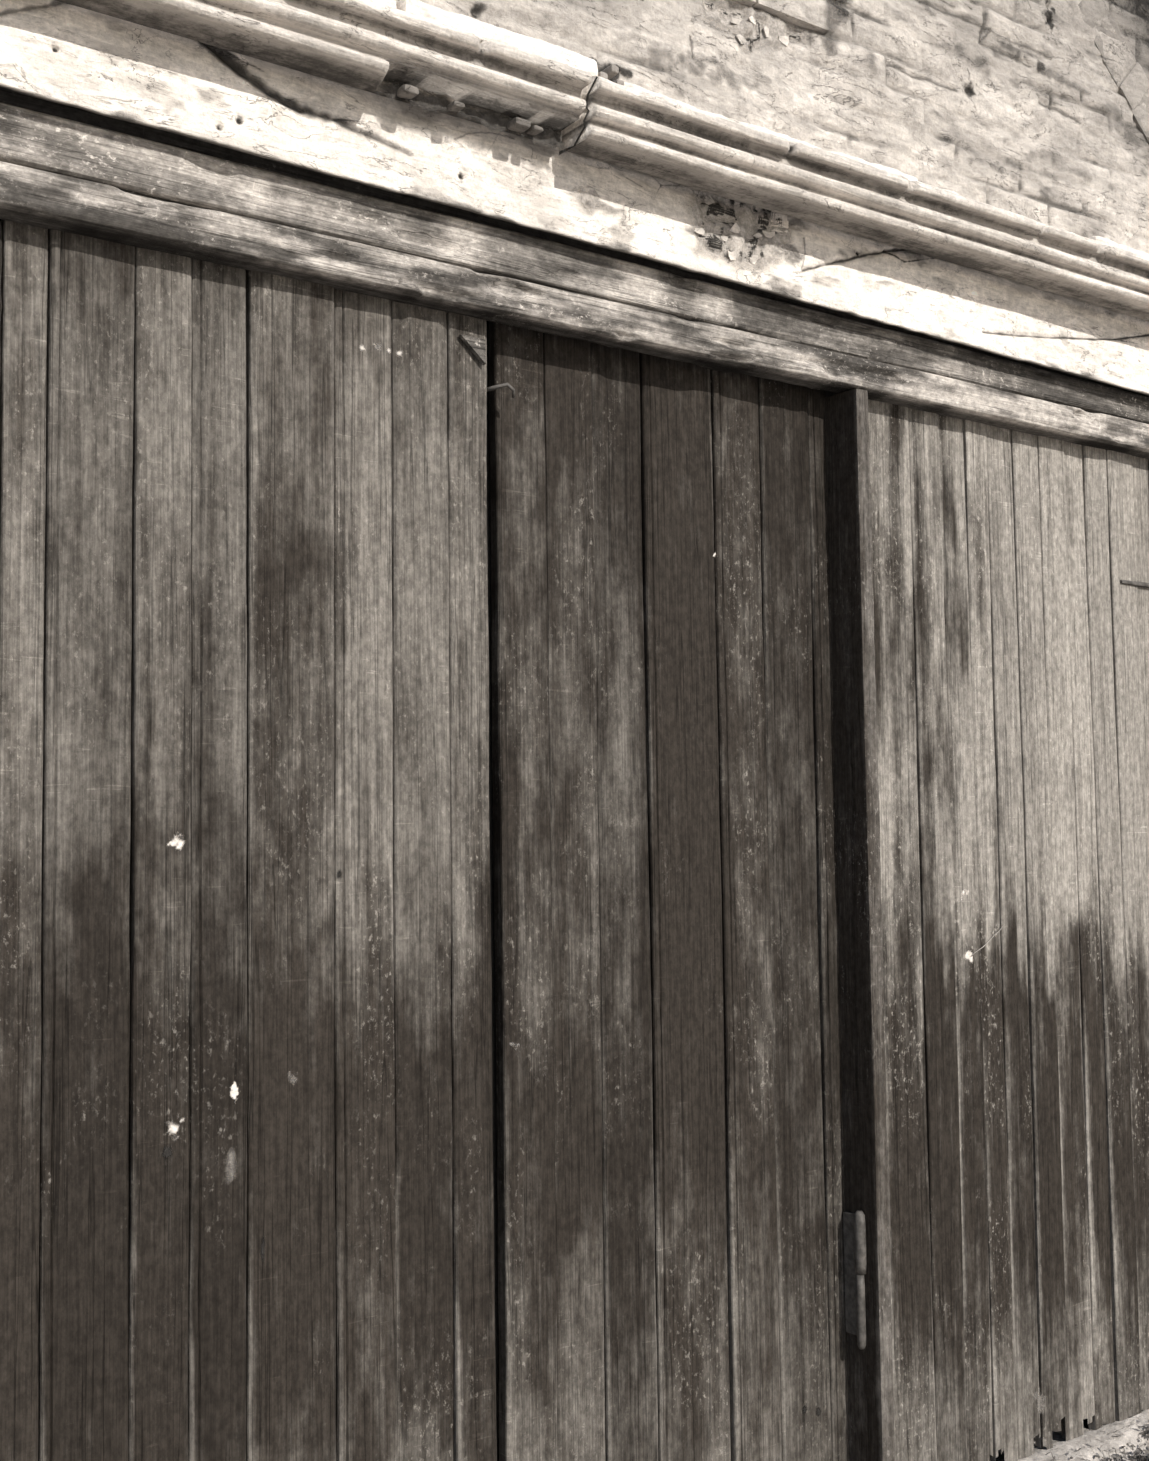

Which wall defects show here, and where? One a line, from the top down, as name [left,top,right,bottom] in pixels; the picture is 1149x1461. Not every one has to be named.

crack [200,42,407,153]
crack [574,76,598,146]
flaking render [692,191,791,269]
crack [802,242,934,272]
crack [983,332,1149,343]